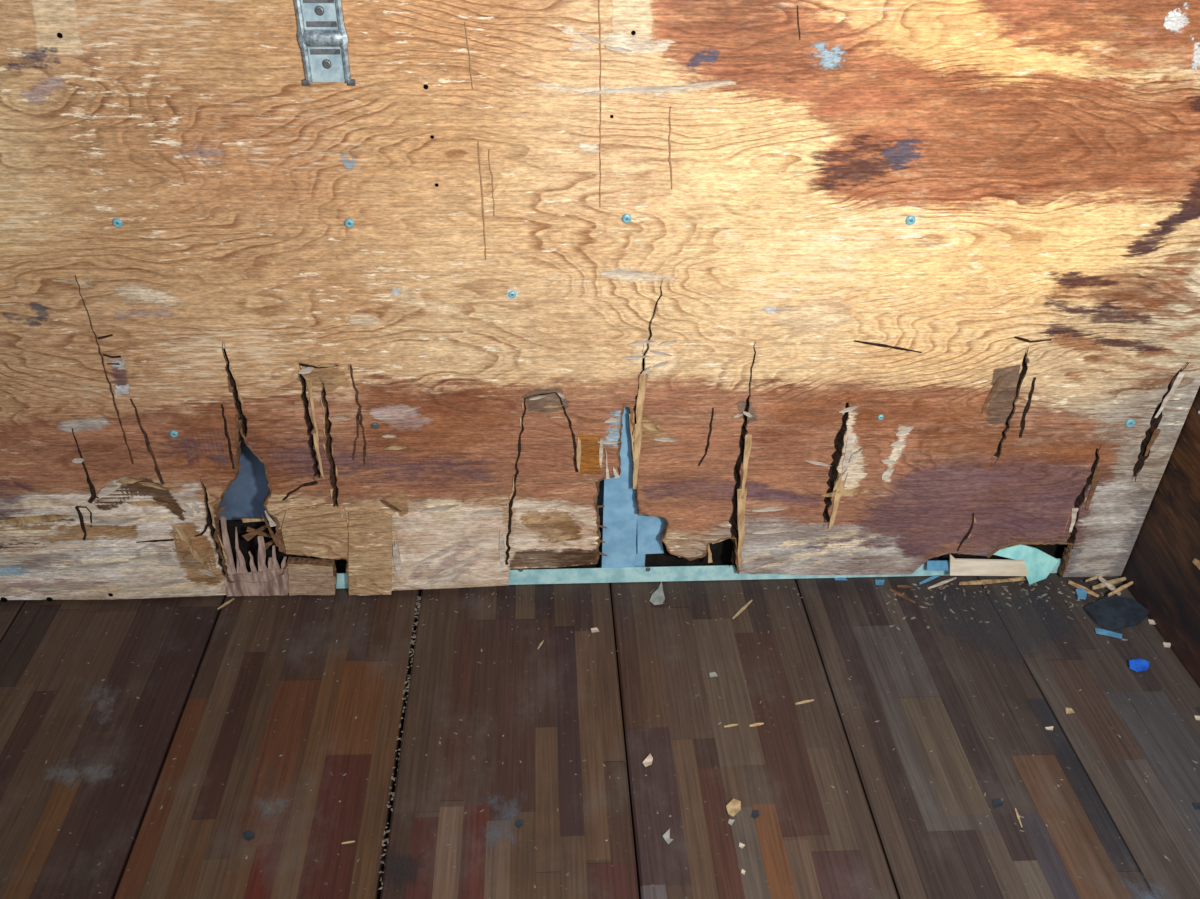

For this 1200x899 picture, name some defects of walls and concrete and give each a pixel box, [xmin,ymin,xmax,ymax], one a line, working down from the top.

damp [651,0,1200,373]
spalling [118,420,349,597]
crack [282,363,366,507]
crack [505,392,578,565]
damp [0,374,1139,576]
spalling [593,404,679,563]
spalling [635,486,740,574]
crack [729,342,756,568]
crack [823,397,856,530]
crack [994,336,1051,464]
hole [987,539,1075,577]
crack [1132,362,1189,482]